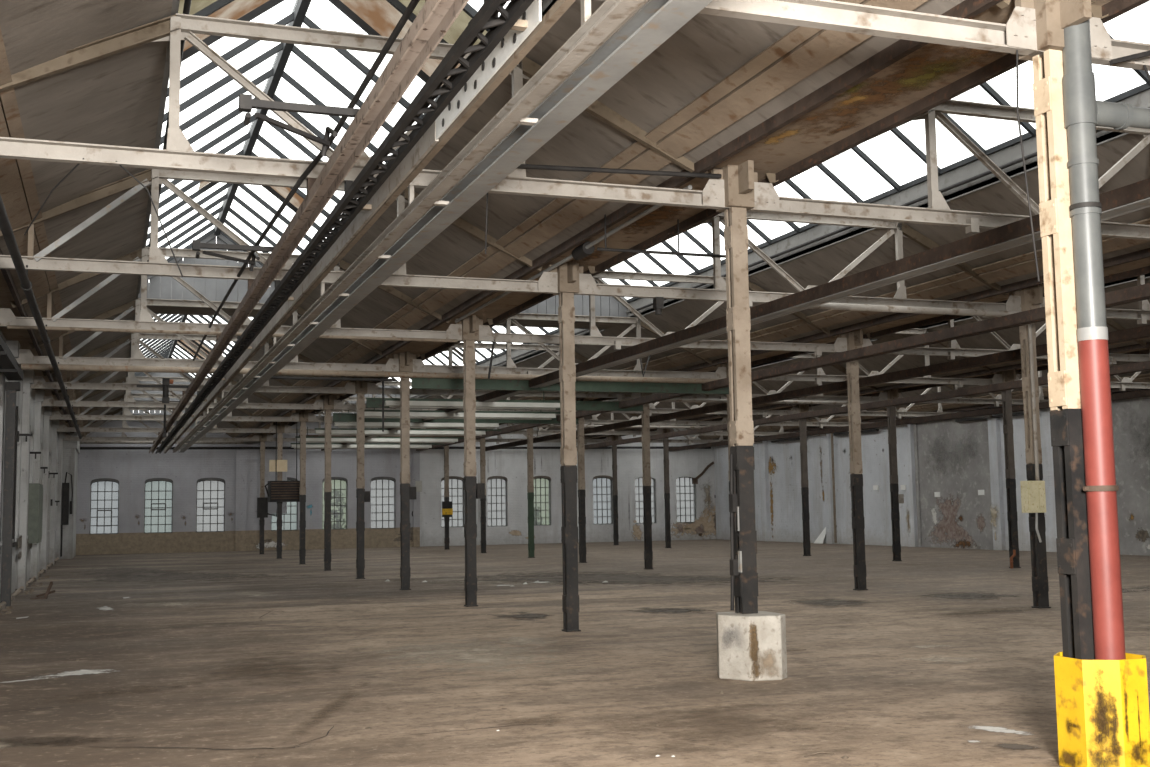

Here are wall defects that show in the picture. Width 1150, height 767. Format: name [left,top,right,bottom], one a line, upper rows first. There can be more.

peeling [670,501,716,539]
peeling [925,494,985,548]